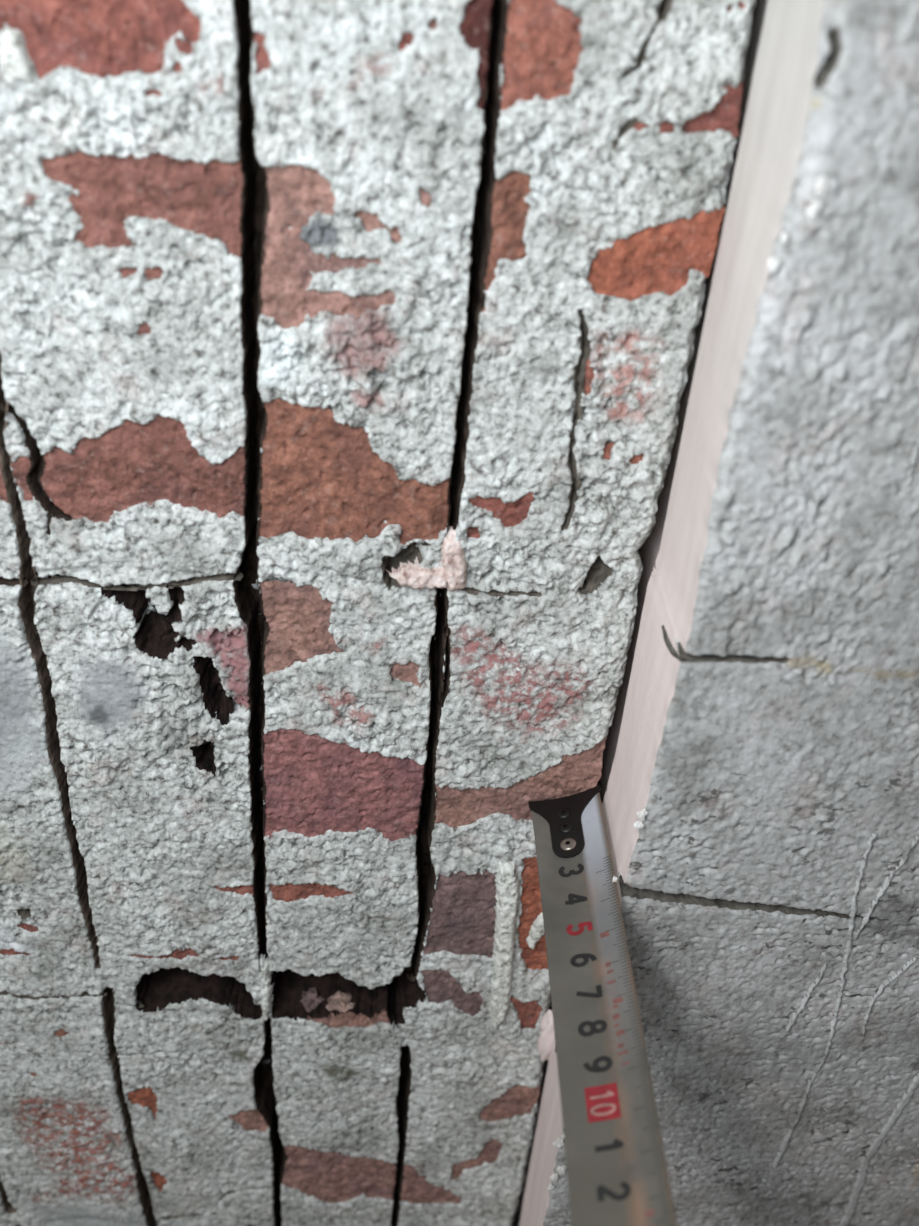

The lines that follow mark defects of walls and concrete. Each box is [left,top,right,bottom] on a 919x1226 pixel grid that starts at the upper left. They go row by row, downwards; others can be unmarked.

spalling [0,0,201,79]
spalling [42,149,243,258]
crack [0,401,72,535]
spalling [0,415,246,523]
spalling [259,398,450,591]
crack [0,568,243,591]
crack [459,587,541,598]
crack [661,625,789,663]
spalling [263,728,607,842]
crack [619,875,884,921]
crack [0,989,144,1008]
spalling [130,948,483,1028]